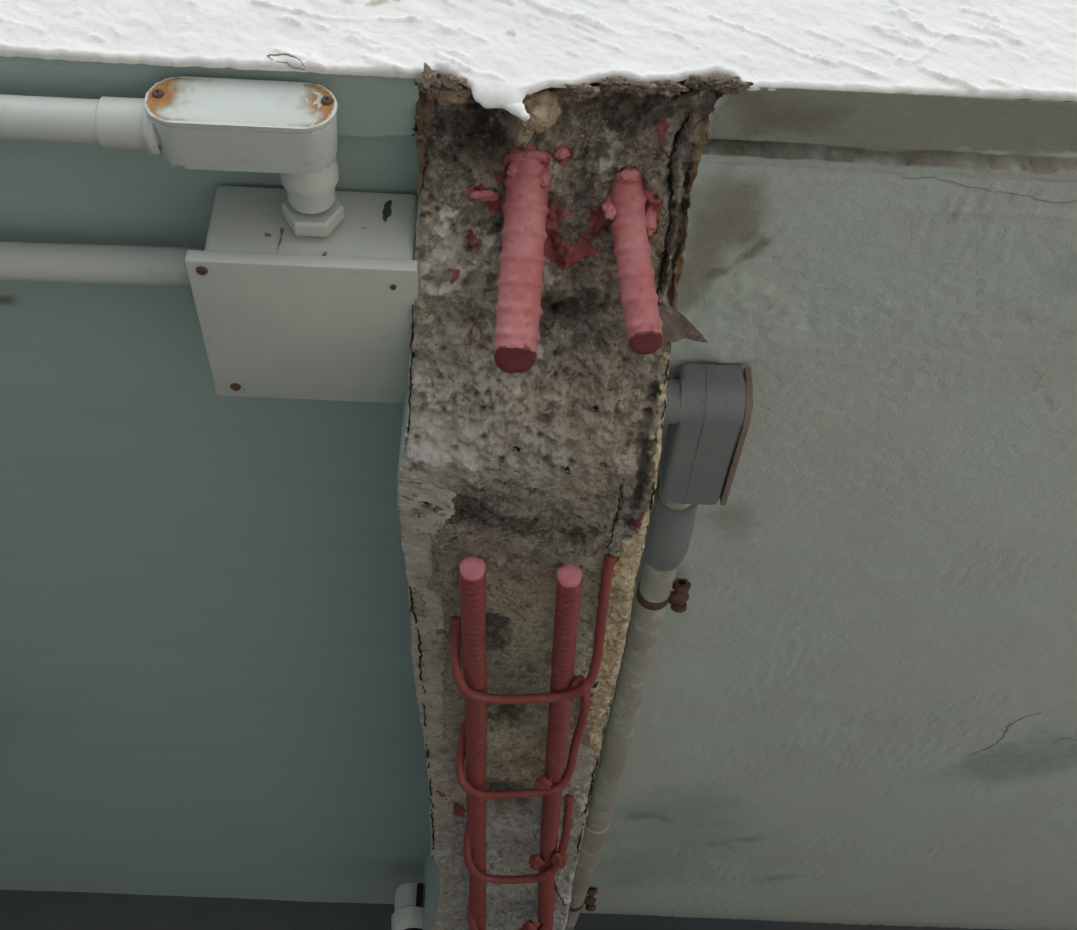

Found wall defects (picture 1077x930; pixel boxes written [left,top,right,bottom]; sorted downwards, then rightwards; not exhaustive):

corrosion [146,77,180,120]
corrosion [304,84,335,126]
crack [651,112,690,306]
crack [903,177,1077,203]
spalling [400,80,727,930]
crack [969,713,1040,756]